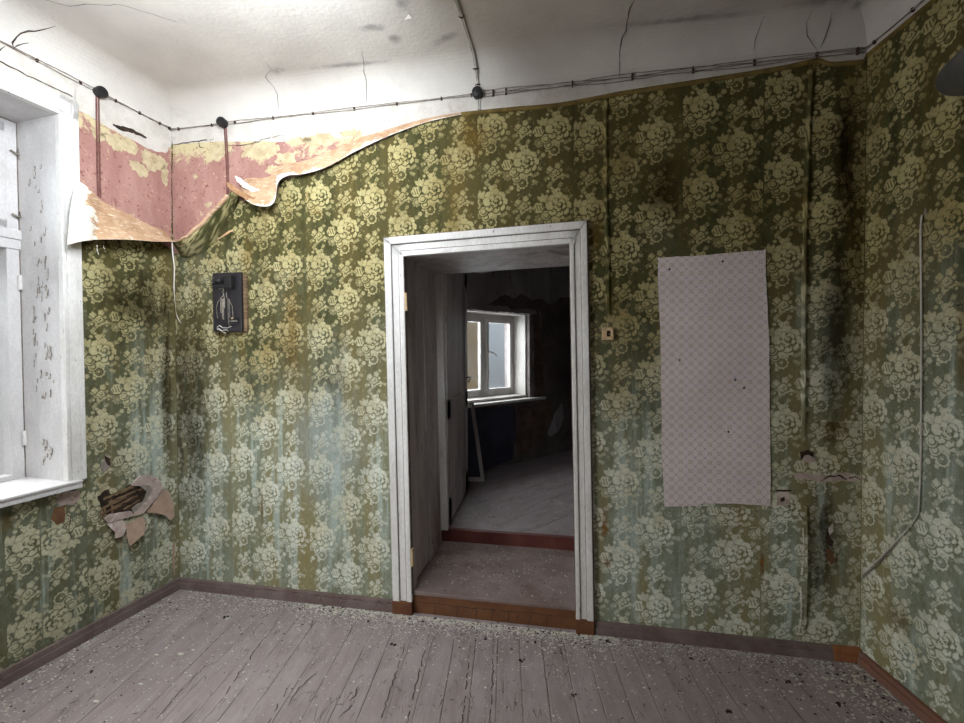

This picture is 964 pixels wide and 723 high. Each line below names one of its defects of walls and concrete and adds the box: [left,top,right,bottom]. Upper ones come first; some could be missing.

crack [0,0,170,97]
crack [619,2,634,74]
peeling [90,127,169,187]
peeling [208,128,366,174]
peeling [32,256,54,399]
peeling [51,490,81,525]
flaking render [97,475,175,546]